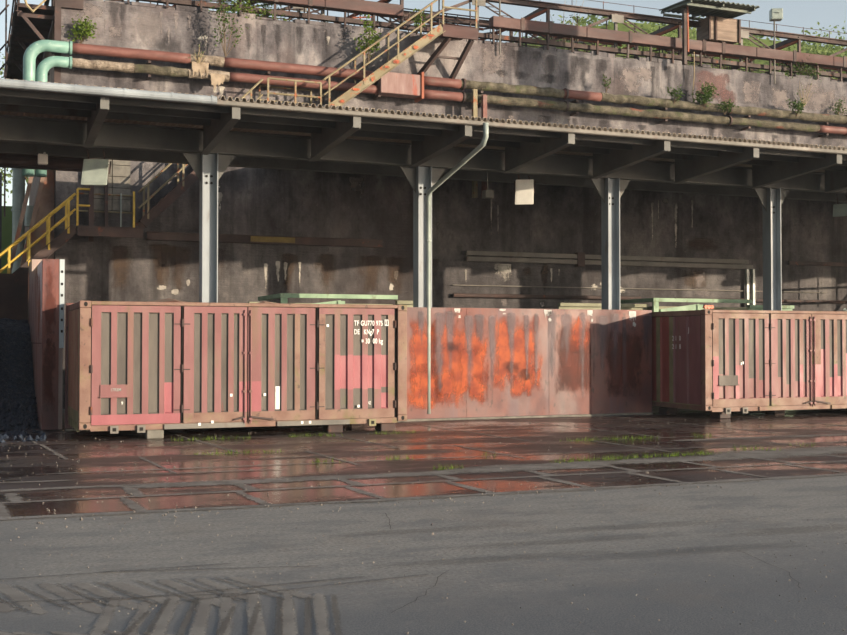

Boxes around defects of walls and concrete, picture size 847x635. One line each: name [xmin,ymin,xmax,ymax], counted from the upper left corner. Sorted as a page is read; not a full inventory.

rust [35,273,56,402]
rust [409,317,542,409]